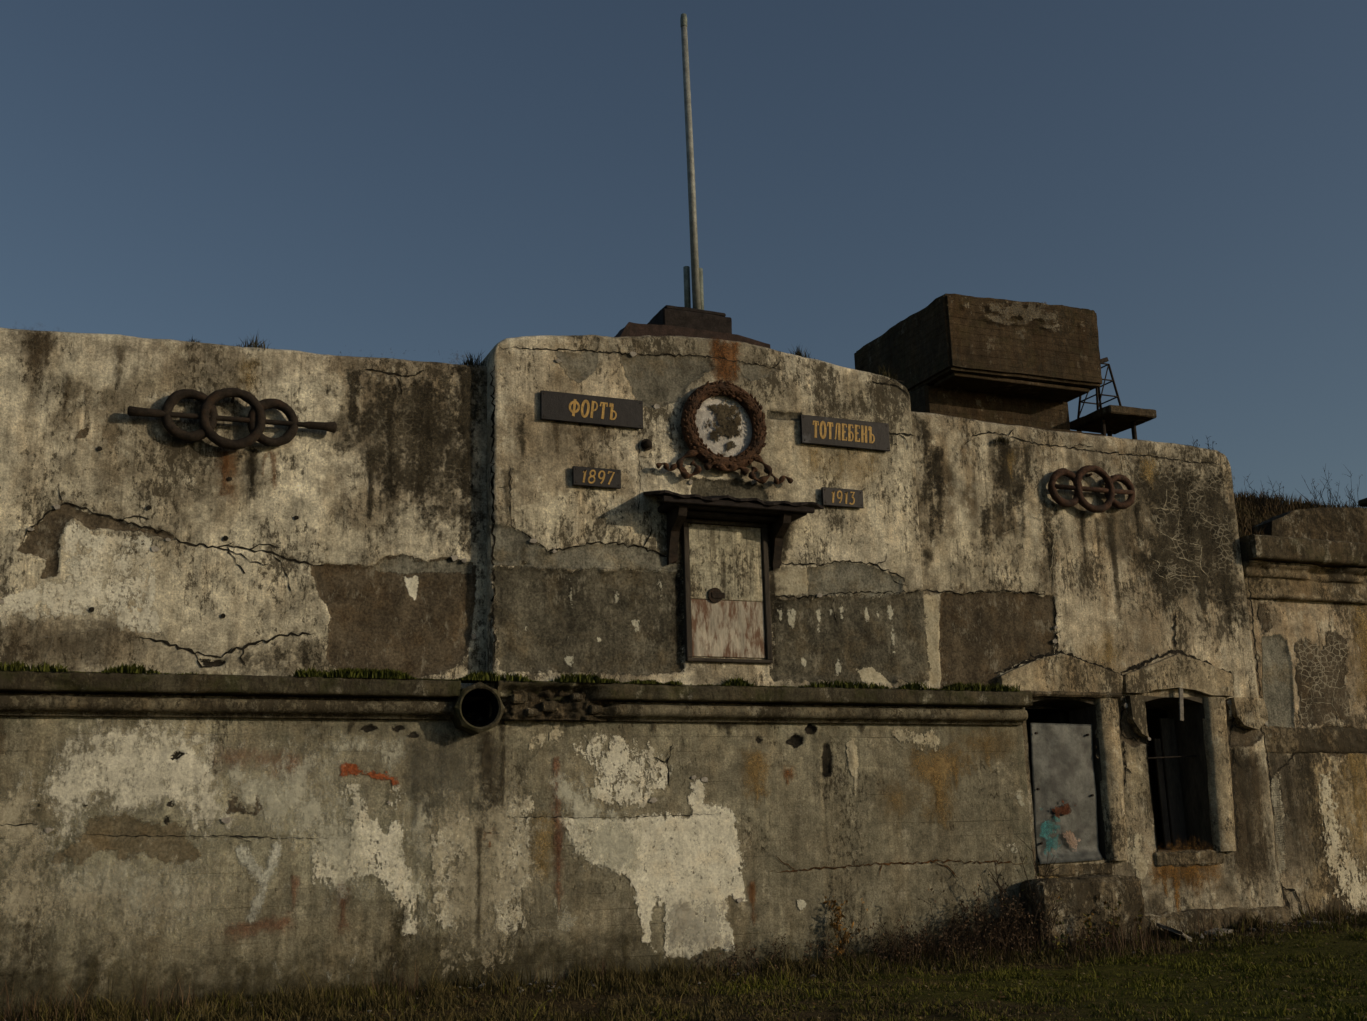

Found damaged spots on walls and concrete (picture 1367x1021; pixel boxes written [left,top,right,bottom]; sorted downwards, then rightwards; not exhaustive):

corrosion [710,339,740,384]
crack [20,490,324,593]
crack [141,632,311,668]
damp [326,354,487,552]
spalling [310,523,685,678]
spalling [786,724,833,777]
crack [770,514,1345,914]
crack [962,429,1225,579]
damp [1080,447,1251,634]
peeling [0,718,748,960]